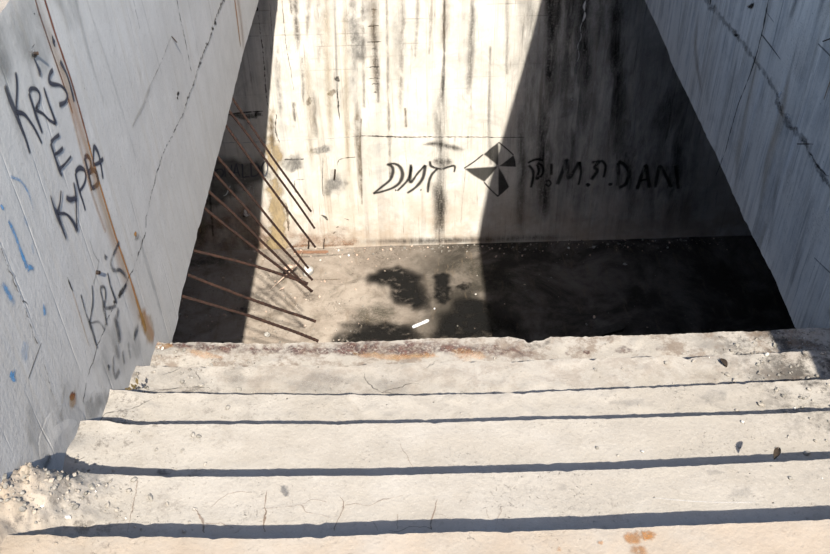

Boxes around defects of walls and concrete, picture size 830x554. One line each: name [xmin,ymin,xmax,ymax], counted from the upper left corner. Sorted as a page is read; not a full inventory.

corrosion [35,0,96,169]
corrosion [99,181,146,331]
leakage [257,118,307,249]
crack [716,0,770,174]
crack [777,103,828,184]
corrosion [625,531,653,543]